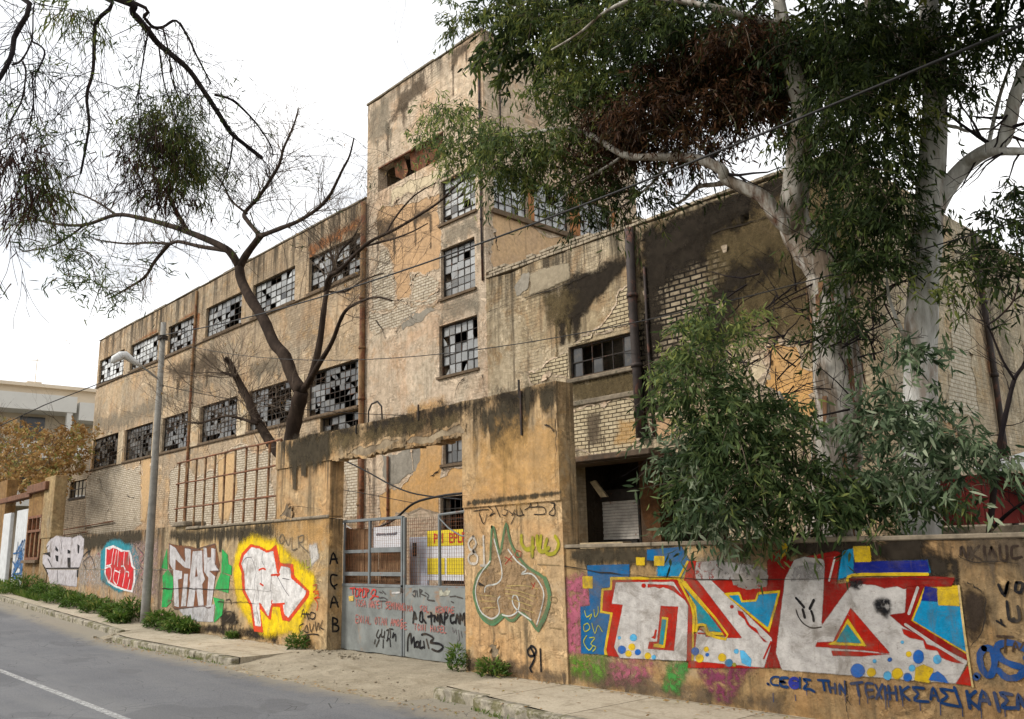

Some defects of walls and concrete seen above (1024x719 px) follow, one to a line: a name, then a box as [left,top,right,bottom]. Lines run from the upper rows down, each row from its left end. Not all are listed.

peeling [368,166,448,335]
leakage [759,176,783,205]
leakage [808,165,849,255]
peeling [526,244,729,455]
leakage [530,193,811,437]
leakage [282,384,557,490]
peeling [343,421,561,526]